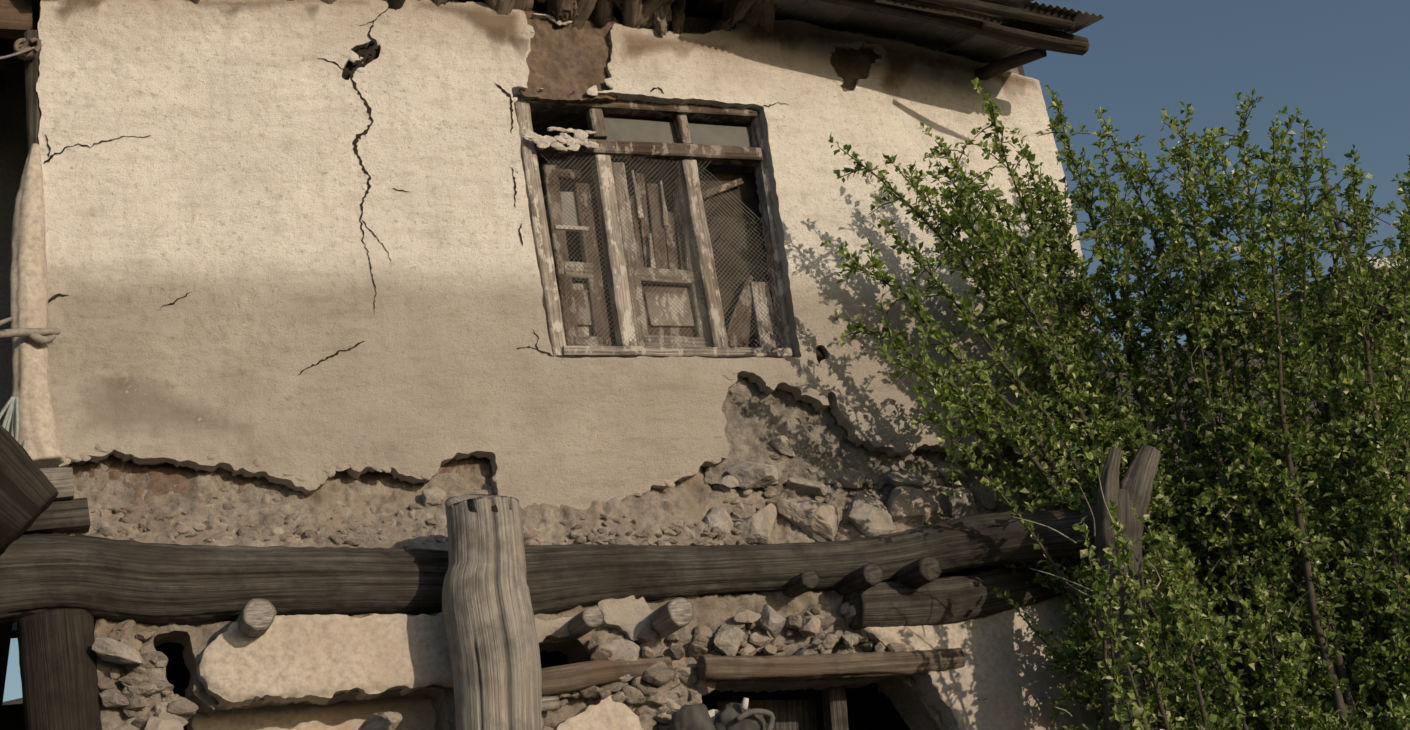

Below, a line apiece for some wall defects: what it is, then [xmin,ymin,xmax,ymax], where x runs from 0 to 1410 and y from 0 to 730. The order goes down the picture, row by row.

flaking render [518,10,619,104]
flaking render [830,41,885,92]
crack [299,9,409,375]
flaking render [703,369,963,488]
flaking render [65,443,195,504]
flaking render [207,454,262,494]
flaking render [275,462,399,494]
flaking render [420,455,502,482]